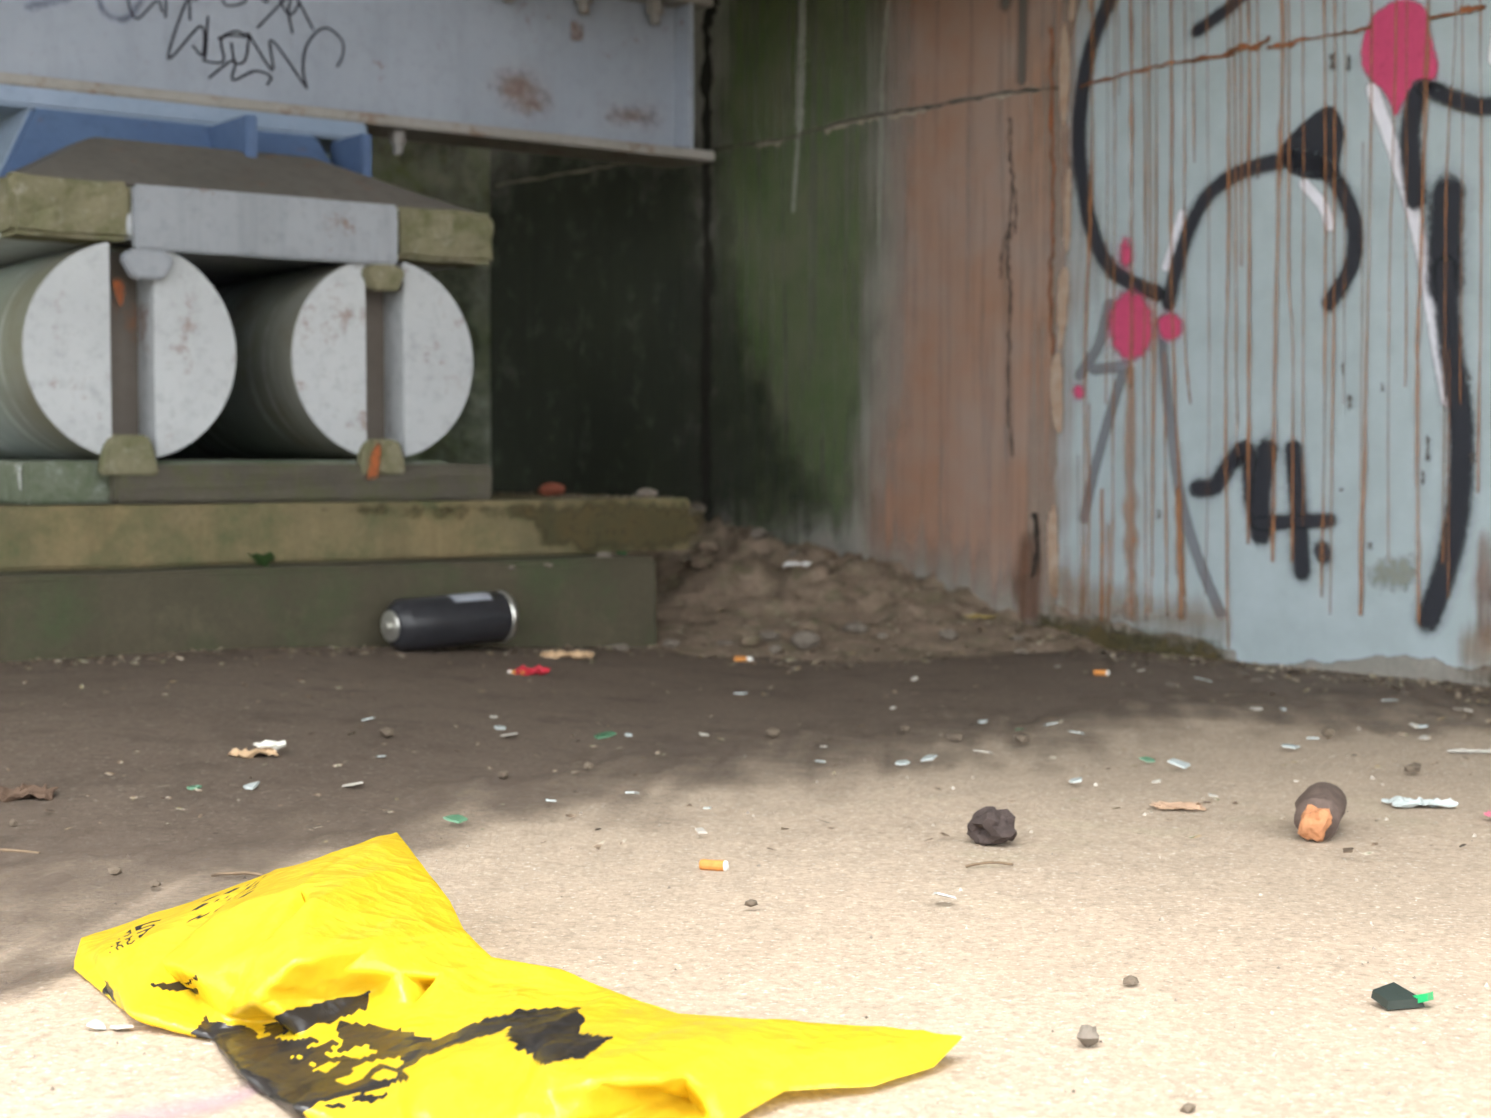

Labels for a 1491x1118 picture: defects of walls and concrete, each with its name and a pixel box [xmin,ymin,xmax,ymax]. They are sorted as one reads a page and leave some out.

crack [495,162,629,187]
damp [792,0,806,212]
crack [699,0,1373,511]
corrosion [873,0,1259,649]
corrosion [1271,0,1304,562]
corrosion [1321,0,1372,616]
corrosion [1388,0,1429,625]
crack [1429,5,1486,20]
corrosion [1442,0,1482,598]